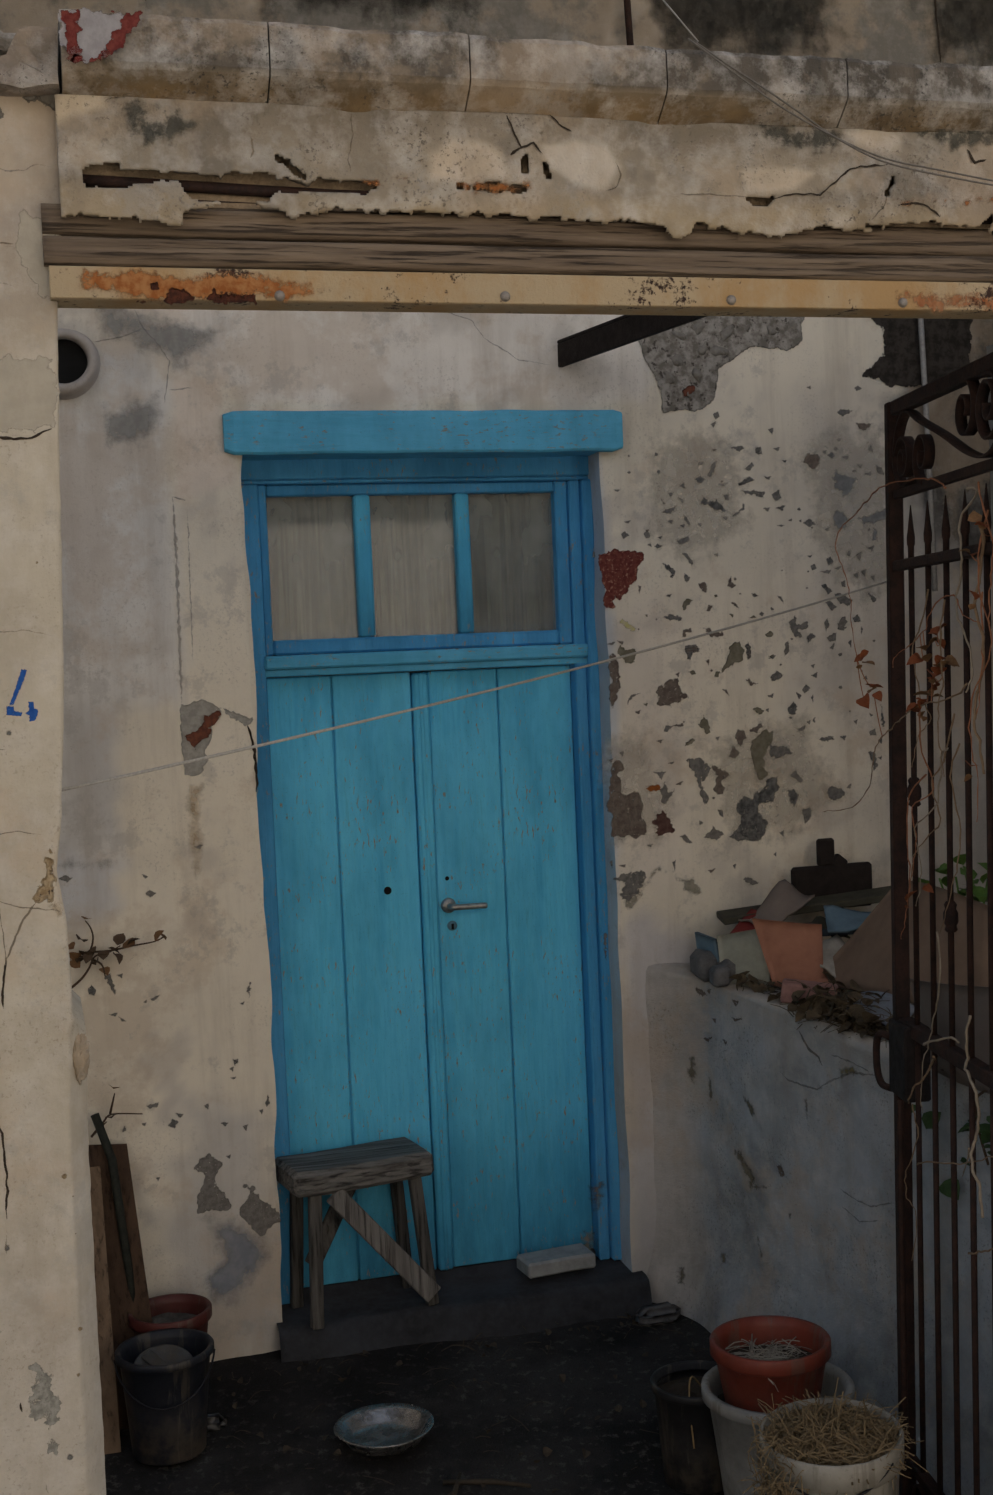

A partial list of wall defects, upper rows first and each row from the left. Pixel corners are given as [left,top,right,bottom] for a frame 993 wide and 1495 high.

spalling [0,26,61,119]
crack [507,115,571,155]
crack [685,164,940,217]
crack [967,149,986,164]
corrosion [81,268,312,305]
corrosion [899,291,993,311]
spalling [639,316,805,427]
peeling [855,318,973,391]
peeling [593,409,886,847]
spalling [180,699,253,776]
crack [0,903,57,1009]
crack [0,1128,9,1248]